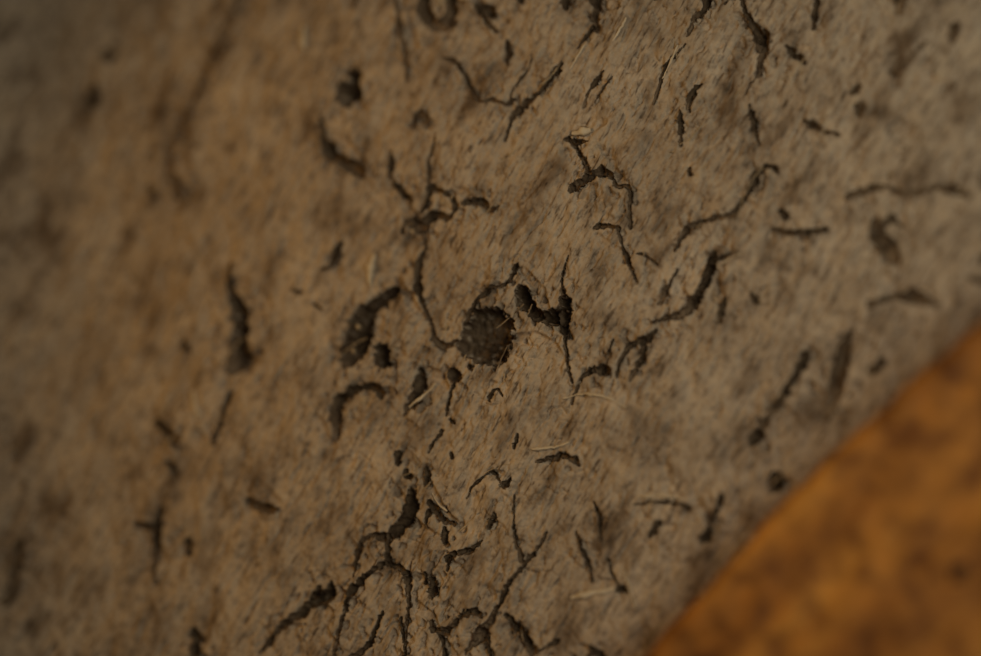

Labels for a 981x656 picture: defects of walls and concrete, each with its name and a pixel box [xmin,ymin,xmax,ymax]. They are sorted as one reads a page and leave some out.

crack [318,116,367,180]
crack [441,57,564,142]
crack [563,0,780,285]
crack [802,118,839,137]
crack [400,132,500,350]
crack [508,250,735,405]
crack [487,388,503,403]
crack [427,429,445,453]
crack [535,451,581,467]
crack [245,497,280,515]
crack [633,493,725,544]
crack [259,487,606,656]